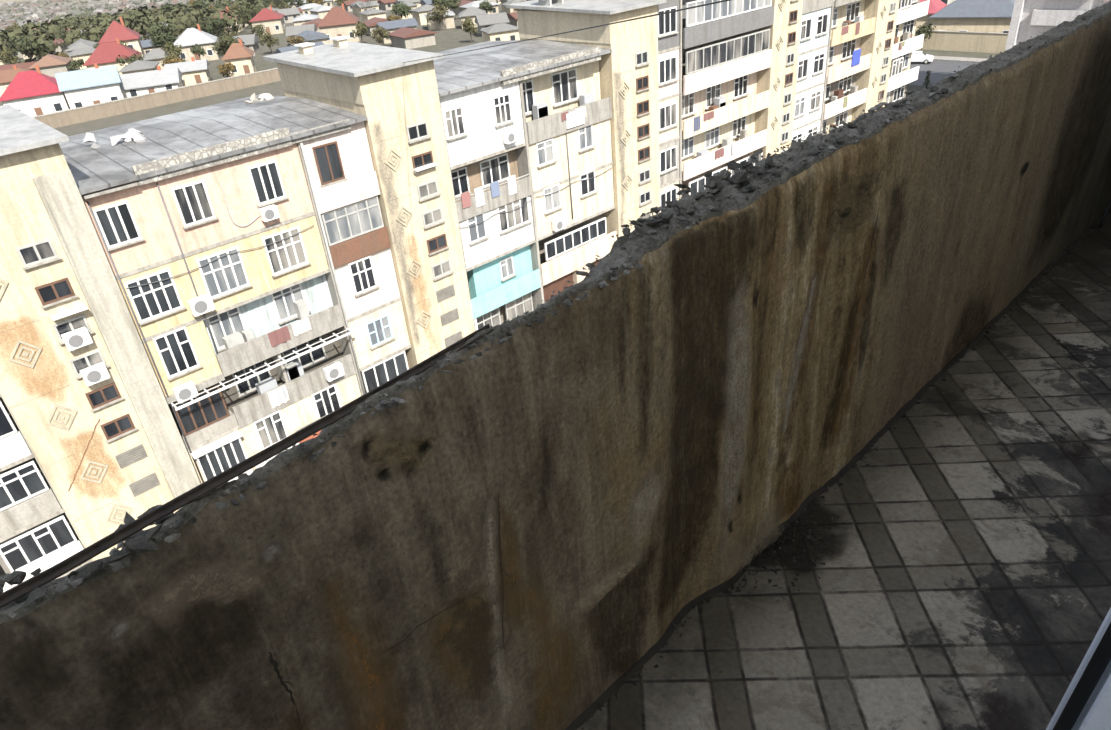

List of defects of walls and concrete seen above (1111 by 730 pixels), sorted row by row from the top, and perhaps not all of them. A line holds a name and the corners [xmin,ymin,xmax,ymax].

damp [615,74,625,196]
spalling [362,436,431,482]
damp [598,211,756,675]
crack [268,652,302,730]